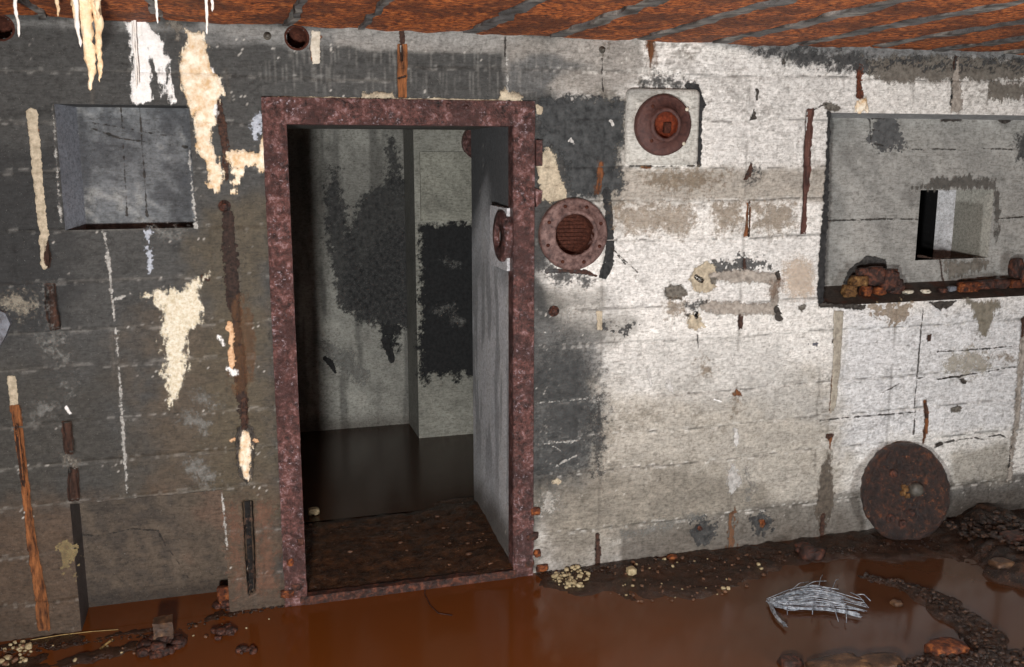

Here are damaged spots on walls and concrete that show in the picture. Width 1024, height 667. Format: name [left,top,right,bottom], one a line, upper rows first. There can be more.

water stain [125,20,264,194]
rust [855,64,869,114]
water stain [588,395,609,478]
rust [525,531,549,572]